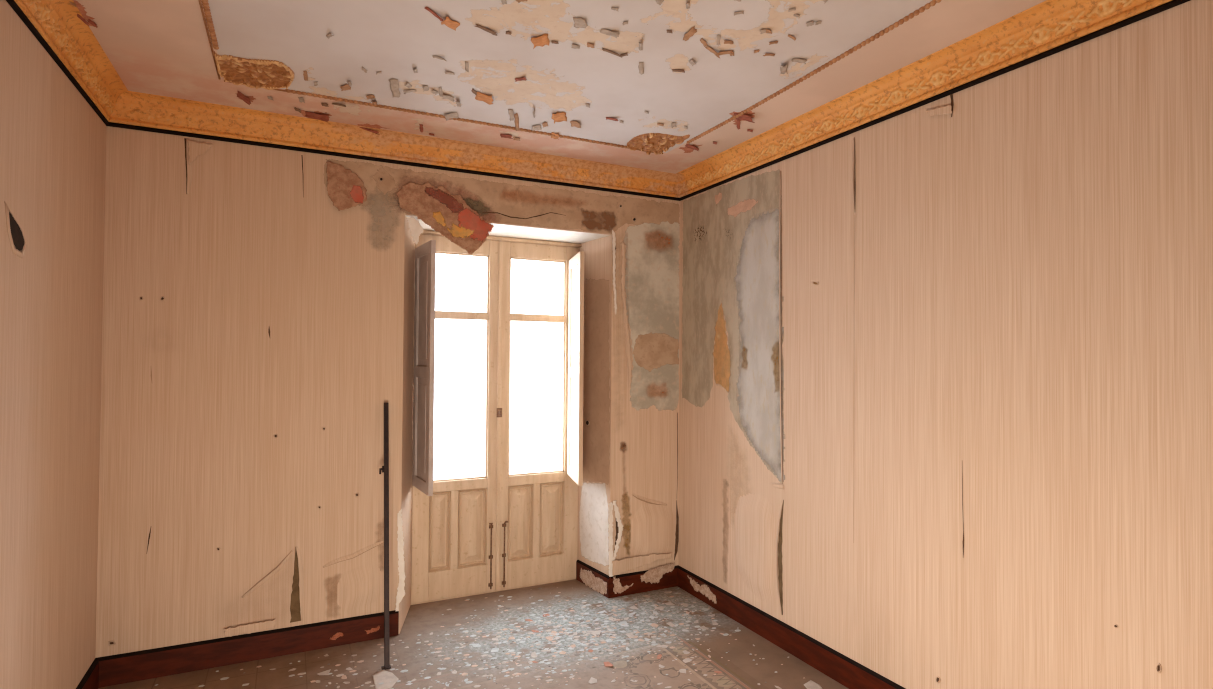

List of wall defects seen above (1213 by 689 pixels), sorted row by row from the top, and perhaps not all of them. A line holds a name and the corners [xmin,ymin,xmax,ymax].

peeling [424,0,829,79]
peeling [235,91,274,105]
peeling [294,67,388,135]
peeling [362,56,592,141]
peeling [638,111,717,153]
peeling [729,110,755,132]
spalling [4,201,27,258]
flaking render [324,159,784,483]
damp [772,344,780,384]
spalling [580,562,675,595]
spalling [687,576,717,604]